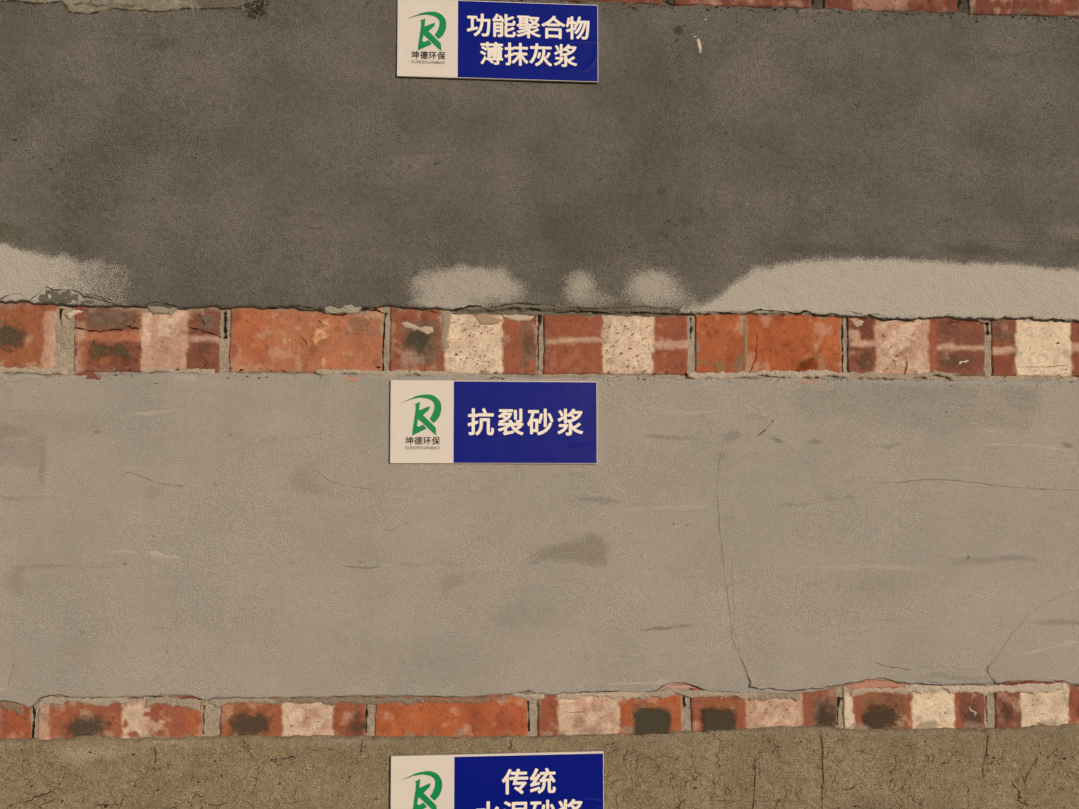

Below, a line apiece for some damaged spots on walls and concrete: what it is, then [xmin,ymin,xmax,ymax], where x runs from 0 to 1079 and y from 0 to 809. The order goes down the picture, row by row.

crack [0,740,346,809]
crack [350,740,406,775]
crack [604,733,955,809]
crack [950,722,1076,809]